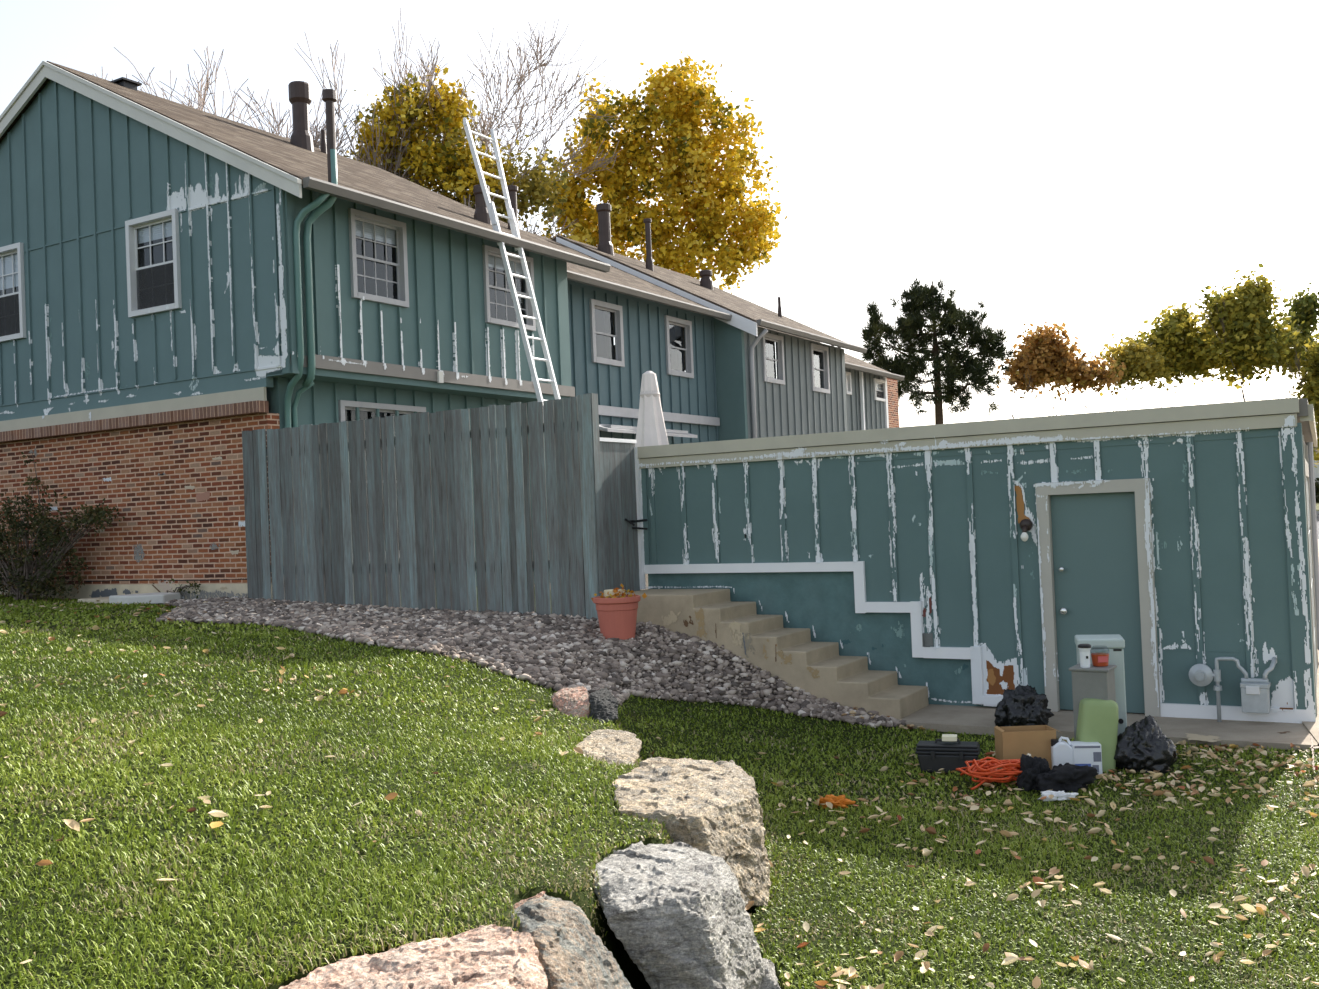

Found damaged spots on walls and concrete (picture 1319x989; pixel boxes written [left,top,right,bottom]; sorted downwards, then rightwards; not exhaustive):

peeling [1015,486,1030,523]
peeling [987,669,996,686]